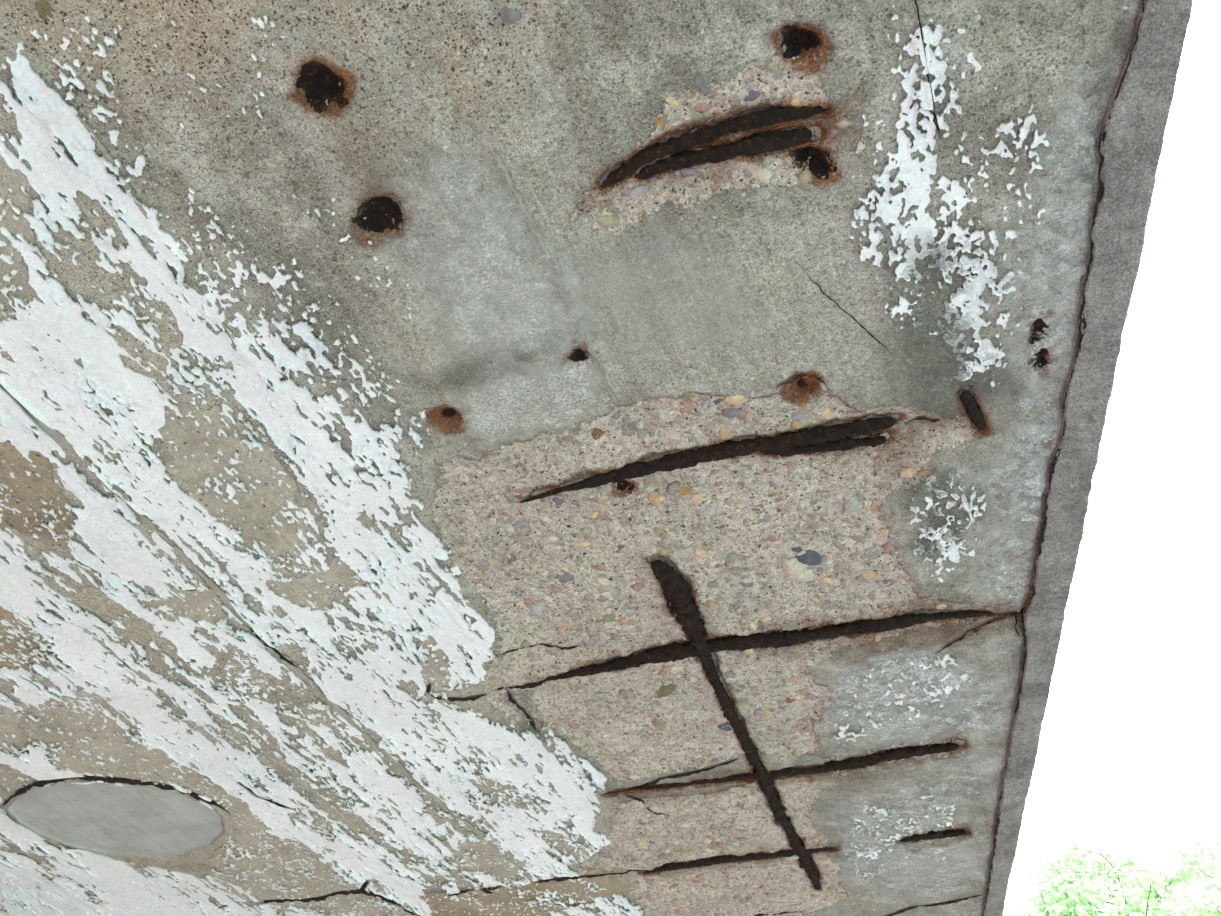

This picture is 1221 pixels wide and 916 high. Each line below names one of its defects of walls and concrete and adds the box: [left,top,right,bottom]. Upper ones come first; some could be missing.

peeling [23,15,55,41]
peeling [59,15,128,58]
corrosion [595,102,853,193]
peeling [849,18,1050,398]
water stain [908,241,1011,414]
spalling [1016,310,1058,378]
spalling [0,22,998,916]
corrosion [519,413,906,500]
crack [887,0,1144,916]
corrosion [602,556,1028,891]